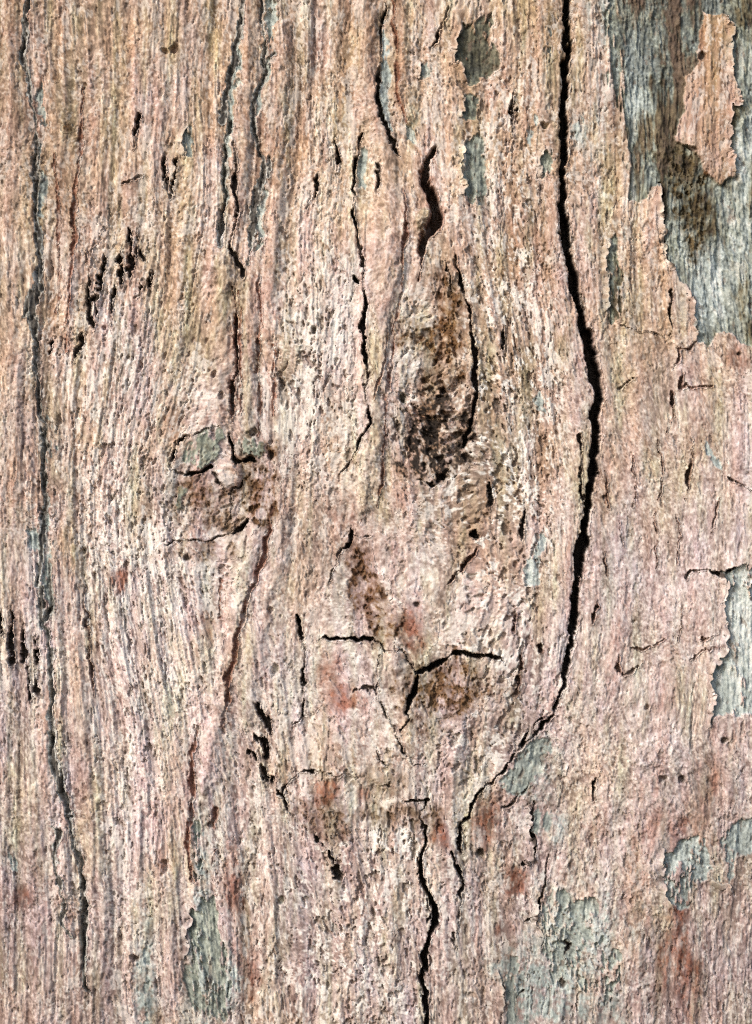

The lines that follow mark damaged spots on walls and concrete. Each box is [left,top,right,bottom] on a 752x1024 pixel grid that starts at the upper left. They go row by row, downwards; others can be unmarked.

crack [119,174,146,185]
peeling [599,0,752,350]
crack [18,0,107,996]
crack [164,0,278,883]
damp [107,252,487,594]
crack [271,0,738,1024]
spalling [614,654,645,677]
peeling [689,561,752,729]
crack [710,476,752,538]
peeling [657,816,752,912]